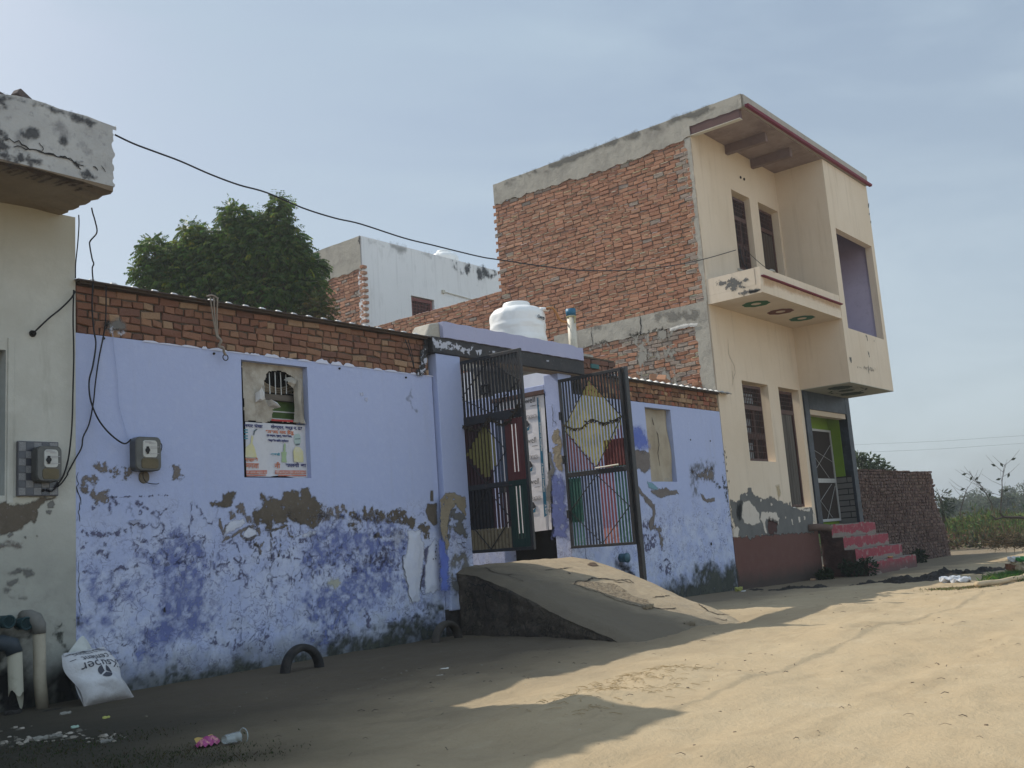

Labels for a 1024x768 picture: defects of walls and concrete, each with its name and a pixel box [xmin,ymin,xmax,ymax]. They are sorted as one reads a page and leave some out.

damp [21,128,39,139]
damp [0,130,94,191]
crack [5,138,106,172]
damp [42,105,95,127]
peeling [432,337,482,356]
peeling [0,496,55,548]
peeling [80,462,132,505]
damp [224,519,257,538]
peeling [210,487,468,560]
peeling [638,486,679,548]
peeling [691,450,815,540]
damp [294,604,447,662]